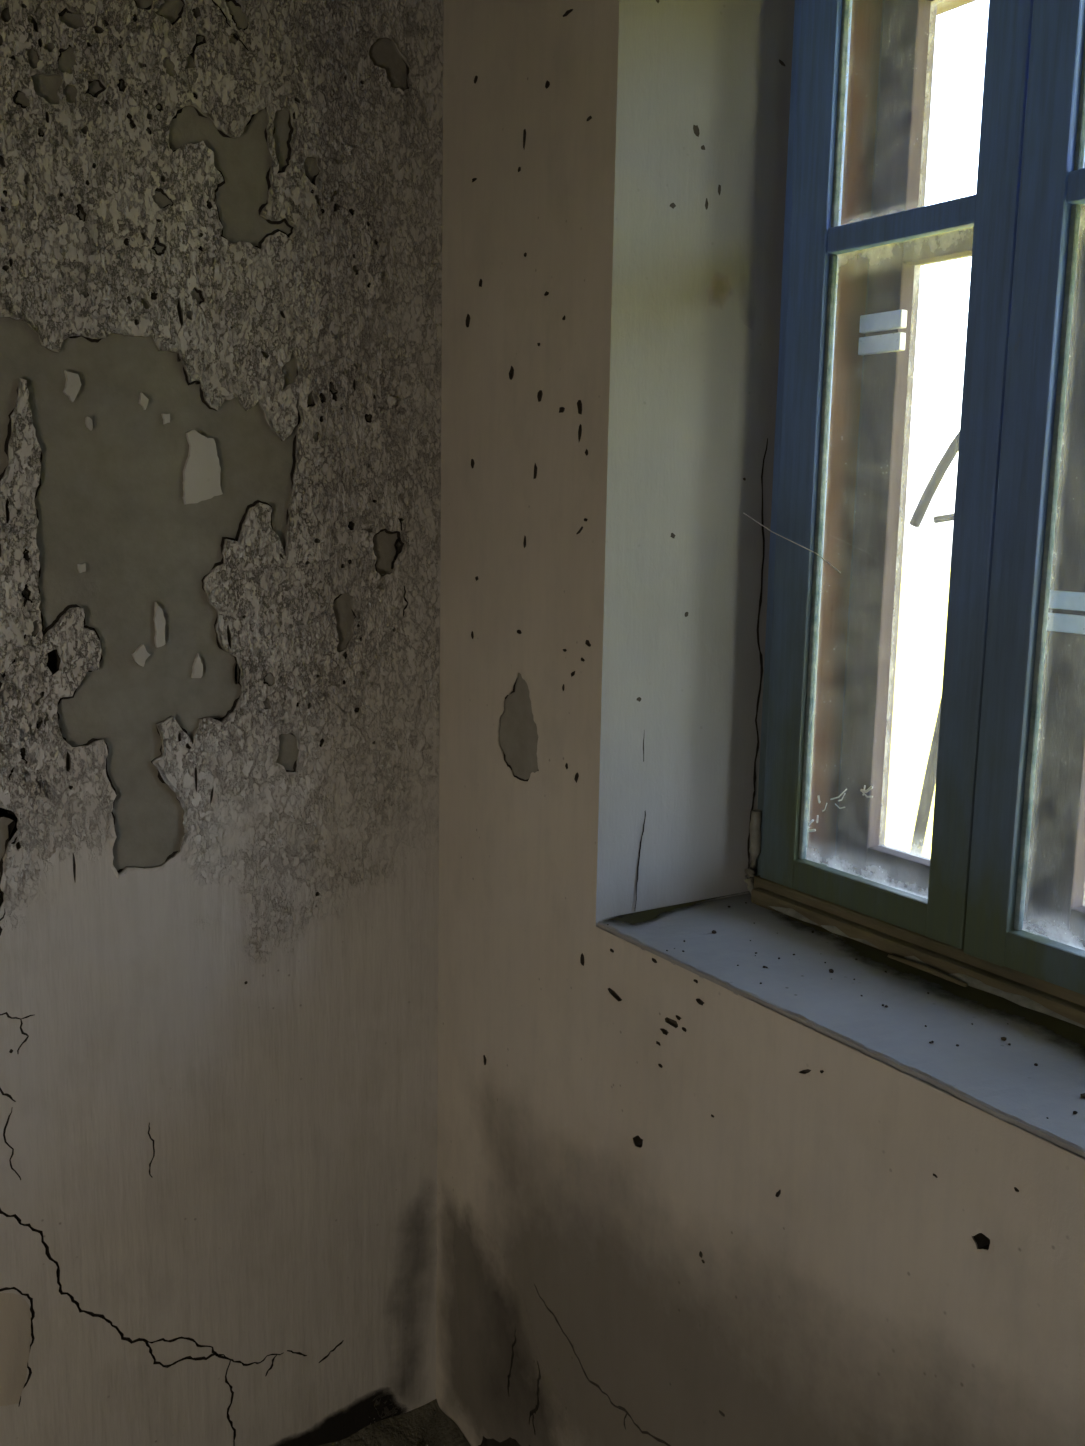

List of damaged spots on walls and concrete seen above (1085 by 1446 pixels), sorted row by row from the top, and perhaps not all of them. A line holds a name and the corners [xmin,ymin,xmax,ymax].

peeling [0,0,413,919]
peeling [497,670,540,785]
crack [0,1088,21,1180]
crack [147,1123,155,1177]
crack [0,1208,344,1446]